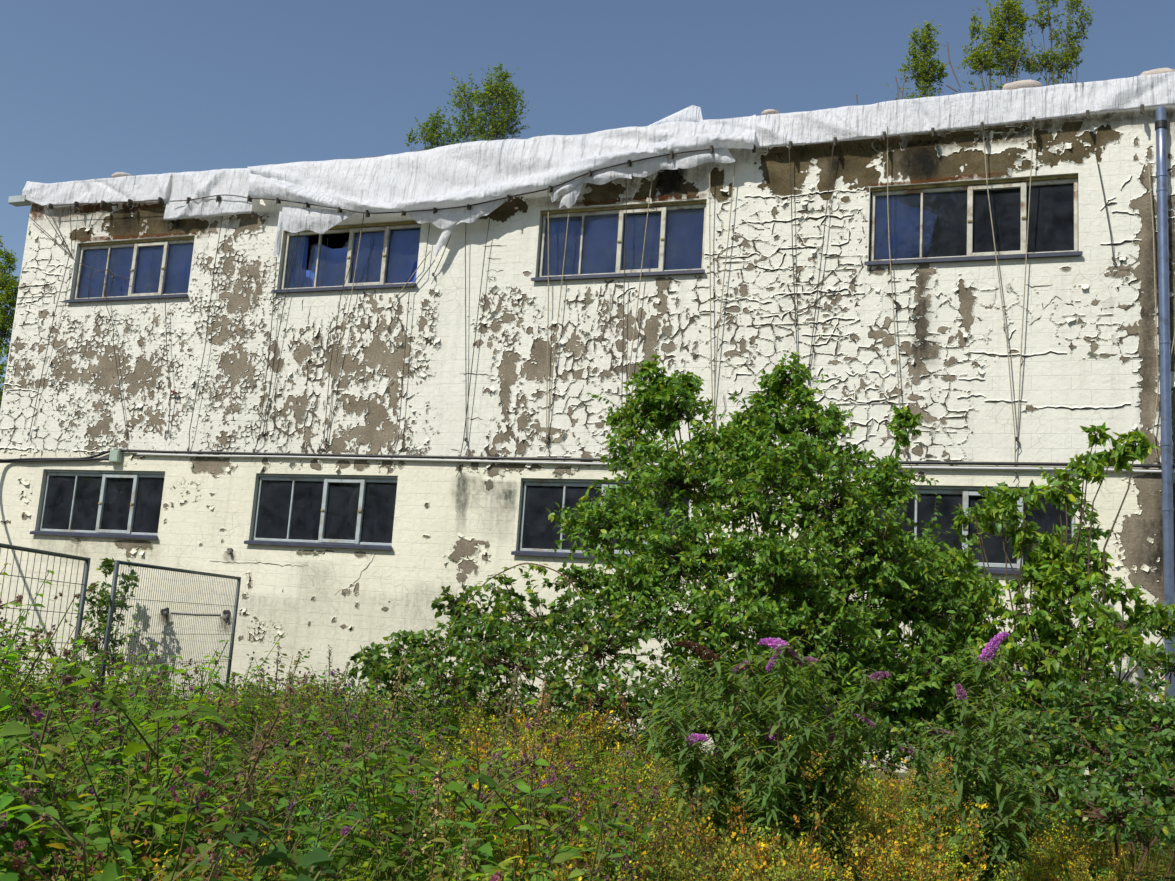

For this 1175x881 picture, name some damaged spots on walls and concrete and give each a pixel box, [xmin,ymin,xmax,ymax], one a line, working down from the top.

crack [1100,175,1142,245]
crack [13,223,80,341]
crack [0,383,108,467]
peeling [1,198,442,524]
peeling [455,270,703,491]
crack [688,183,898,445]
peeling [753,120,1175,613]
crack [957,284,1131,410]
peeling [114,538,153,559]
peeling [441,531,491,589]